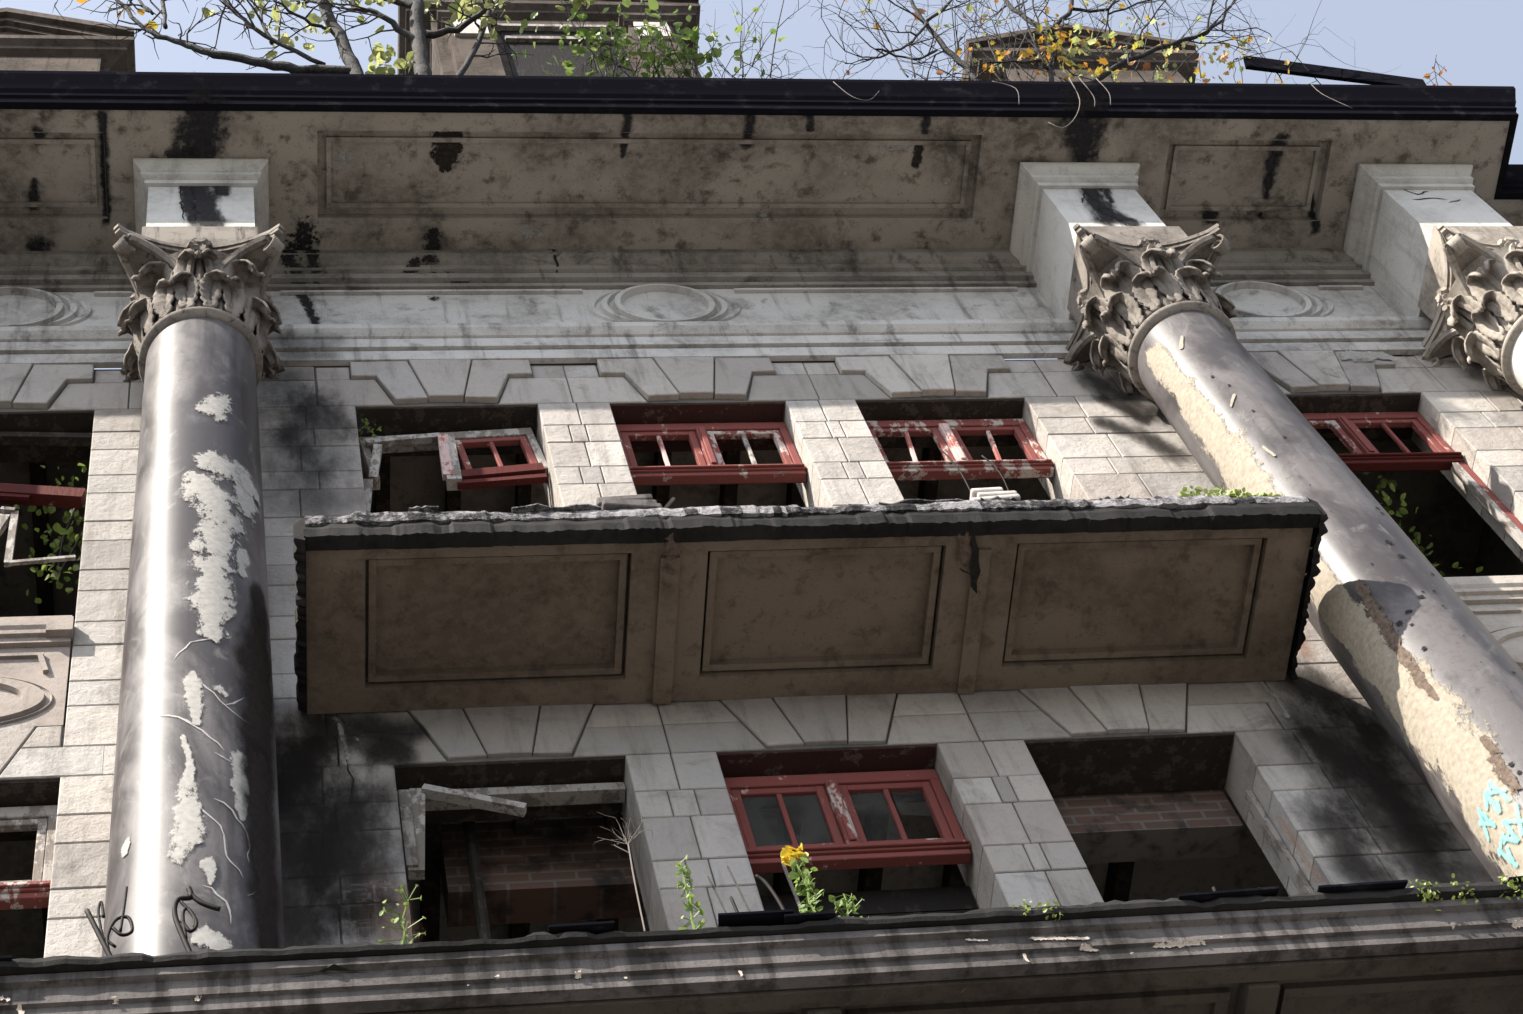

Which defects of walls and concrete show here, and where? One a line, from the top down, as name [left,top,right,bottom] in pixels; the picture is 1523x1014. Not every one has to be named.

damp [165,84,229,158]
damp [1055,84,1109,162]
damp [181,186,231,227]
damp [1081,188,1140,226]
damp [1257,134,1288,222]
crack [158,639,243,763]
peeling [1310,550,1523,880]
peeling [167,670,228,885]
peeling [229,750,249,821]
peeling [121,837,130,857]
crack [201,798,253,922]
peeling [191,925,233,950]